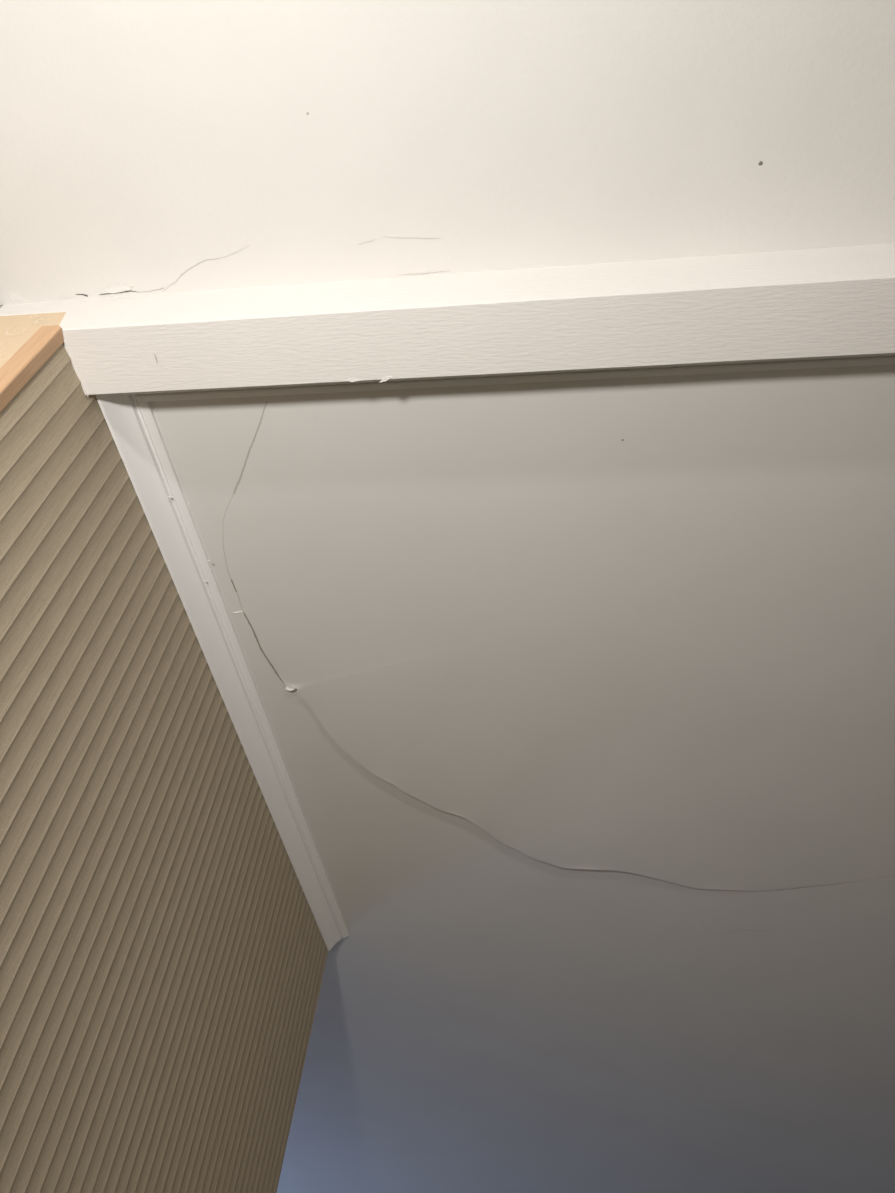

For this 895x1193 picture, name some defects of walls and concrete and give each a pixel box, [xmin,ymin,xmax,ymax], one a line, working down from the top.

crack [76,247,246,297]
crack [222,402,895,891]